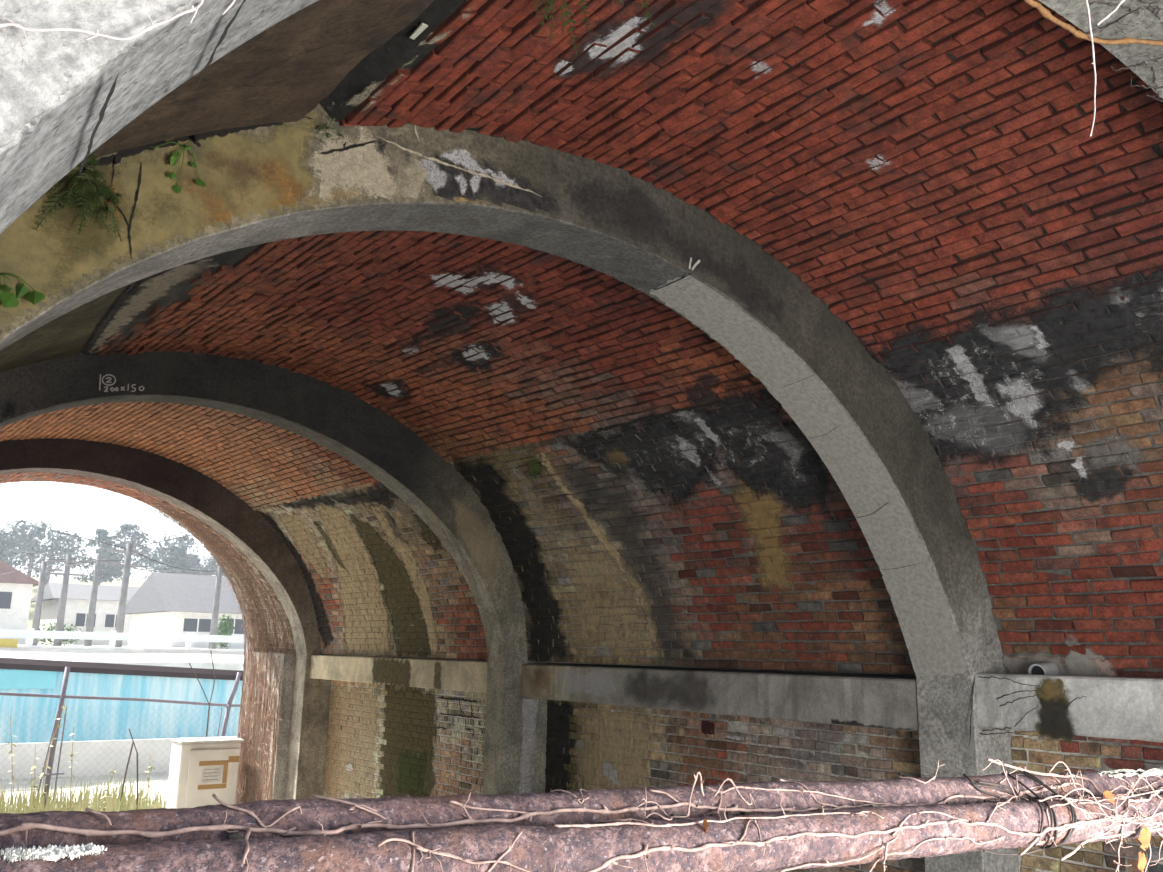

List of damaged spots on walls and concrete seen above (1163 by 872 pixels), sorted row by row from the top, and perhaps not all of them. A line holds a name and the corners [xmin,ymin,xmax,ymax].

crack [79,0,312,259]
peeling [301,126,427,203]
peeling [444,150,513,204]
damp [946,346,1040,422]
damp [677,435,700,465]
damp [694,418,721,444]
damp [456,452,706,793]